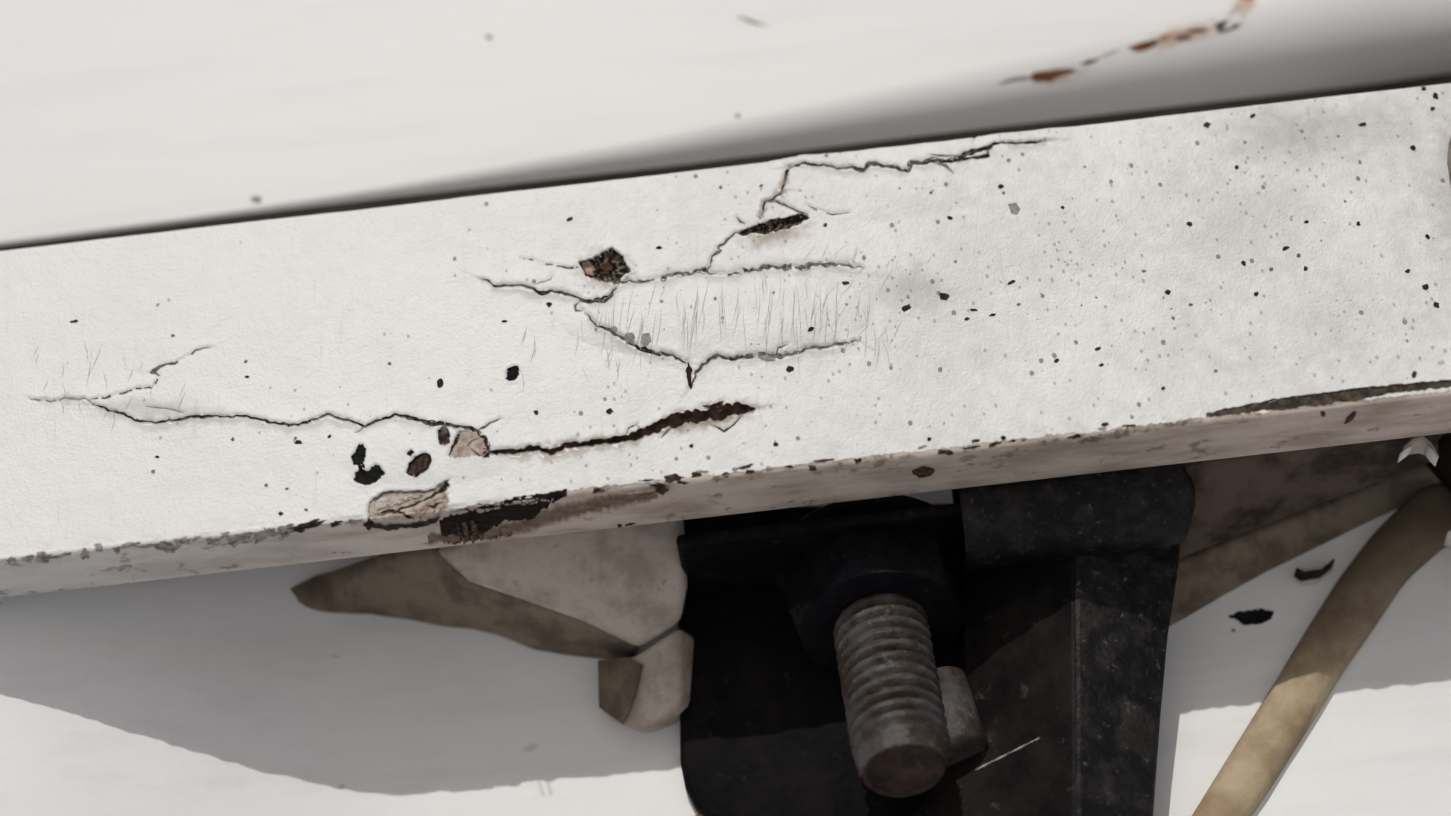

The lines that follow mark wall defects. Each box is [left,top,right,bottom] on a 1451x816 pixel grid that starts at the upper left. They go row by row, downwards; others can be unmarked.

corrosion [997,0,1246,84]
crack [760,140,1046,217]
hole [523,248,631,284]
crack [29,248,861,455]
peeling [889,371,1451,478]
peeling [6,425,870,565]
peeling [1294,559,1335,585]